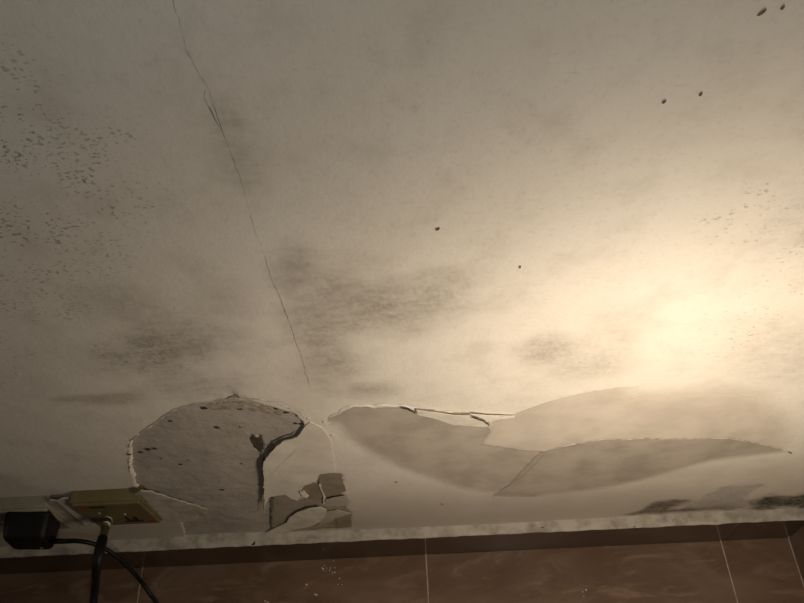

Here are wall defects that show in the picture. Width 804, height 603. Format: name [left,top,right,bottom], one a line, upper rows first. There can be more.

peeling [126,389,792,535]
damp [753,495,804,509]